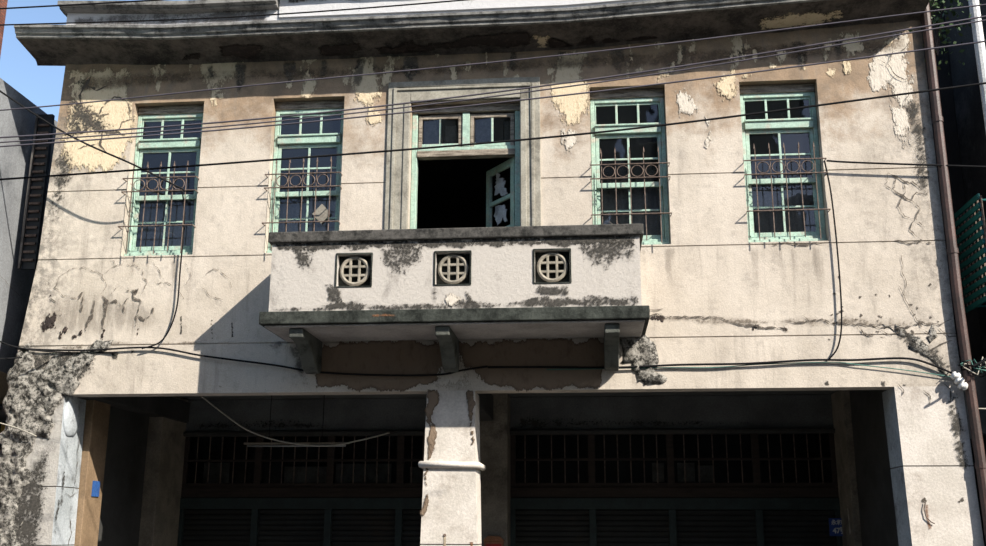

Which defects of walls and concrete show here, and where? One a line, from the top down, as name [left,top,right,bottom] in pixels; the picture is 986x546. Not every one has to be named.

peeling [59,67,137,173]
peeling [286,32,665,153]
peeling [713,34,757,101]
peeling [822,28,917,149]
crack [50,260,232,329]
water stain [276,236,635,275]
water stain [313,284,638,311]
crack [650,166,956,350]
water stain [34,348,96,386]
flaking render [315,338,604,516]
water stain [948,396,970,469]
water stain [14,452,65,546]